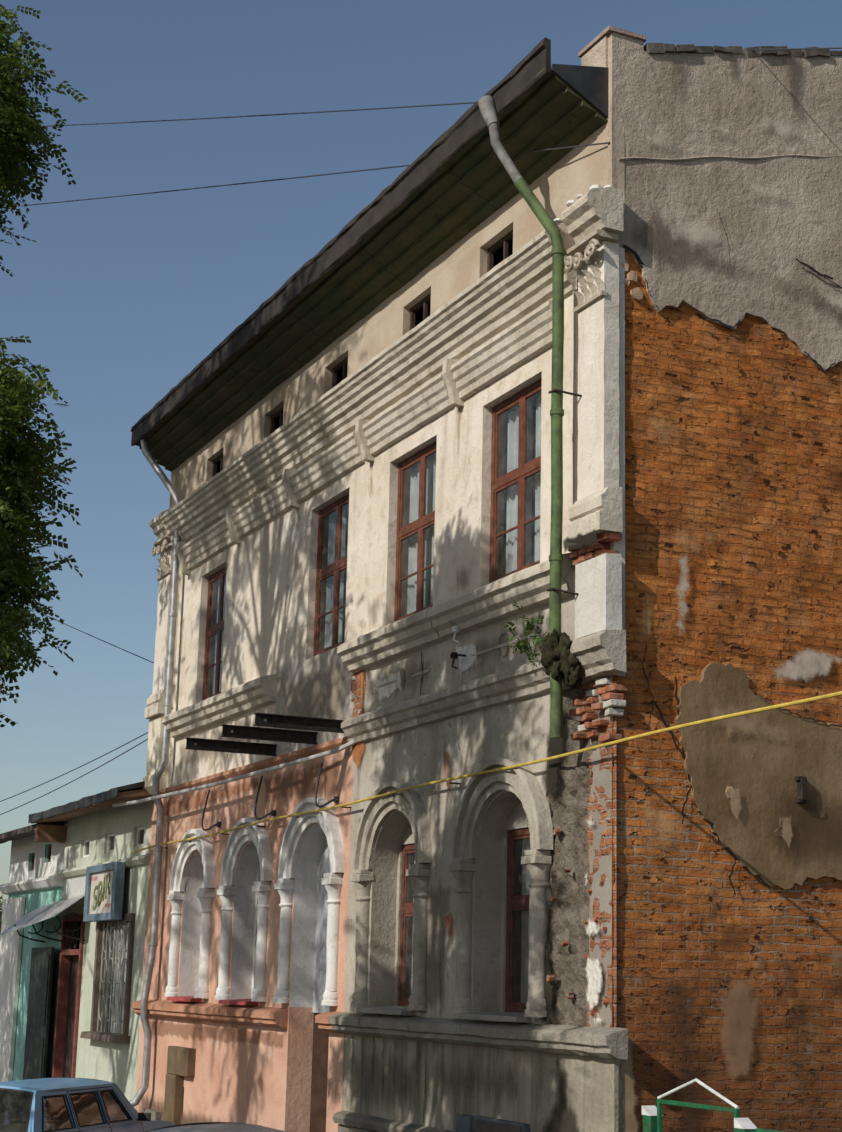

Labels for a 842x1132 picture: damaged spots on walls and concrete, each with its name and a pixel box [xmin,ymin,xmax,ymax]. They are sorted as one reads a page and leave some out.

leakage [786,57,802,109]
crack [796,258,842,289]
flaking render [350,670,402,718]
flaking render [546,250,842,1132]
leakage [543,1065,578,1132]